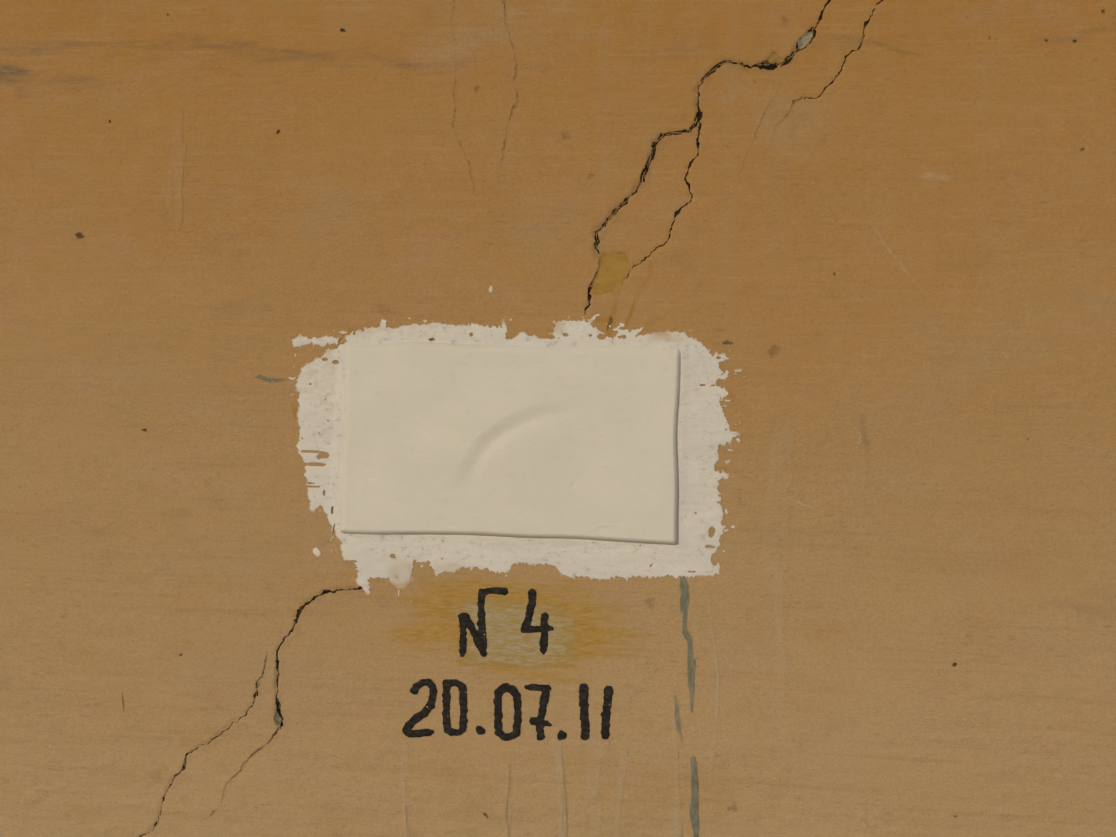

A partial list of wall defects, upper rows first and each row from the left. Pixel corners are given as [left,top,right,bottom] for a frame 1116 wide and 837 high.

crack [584,0,884,310]
crack [137,584,365,837]